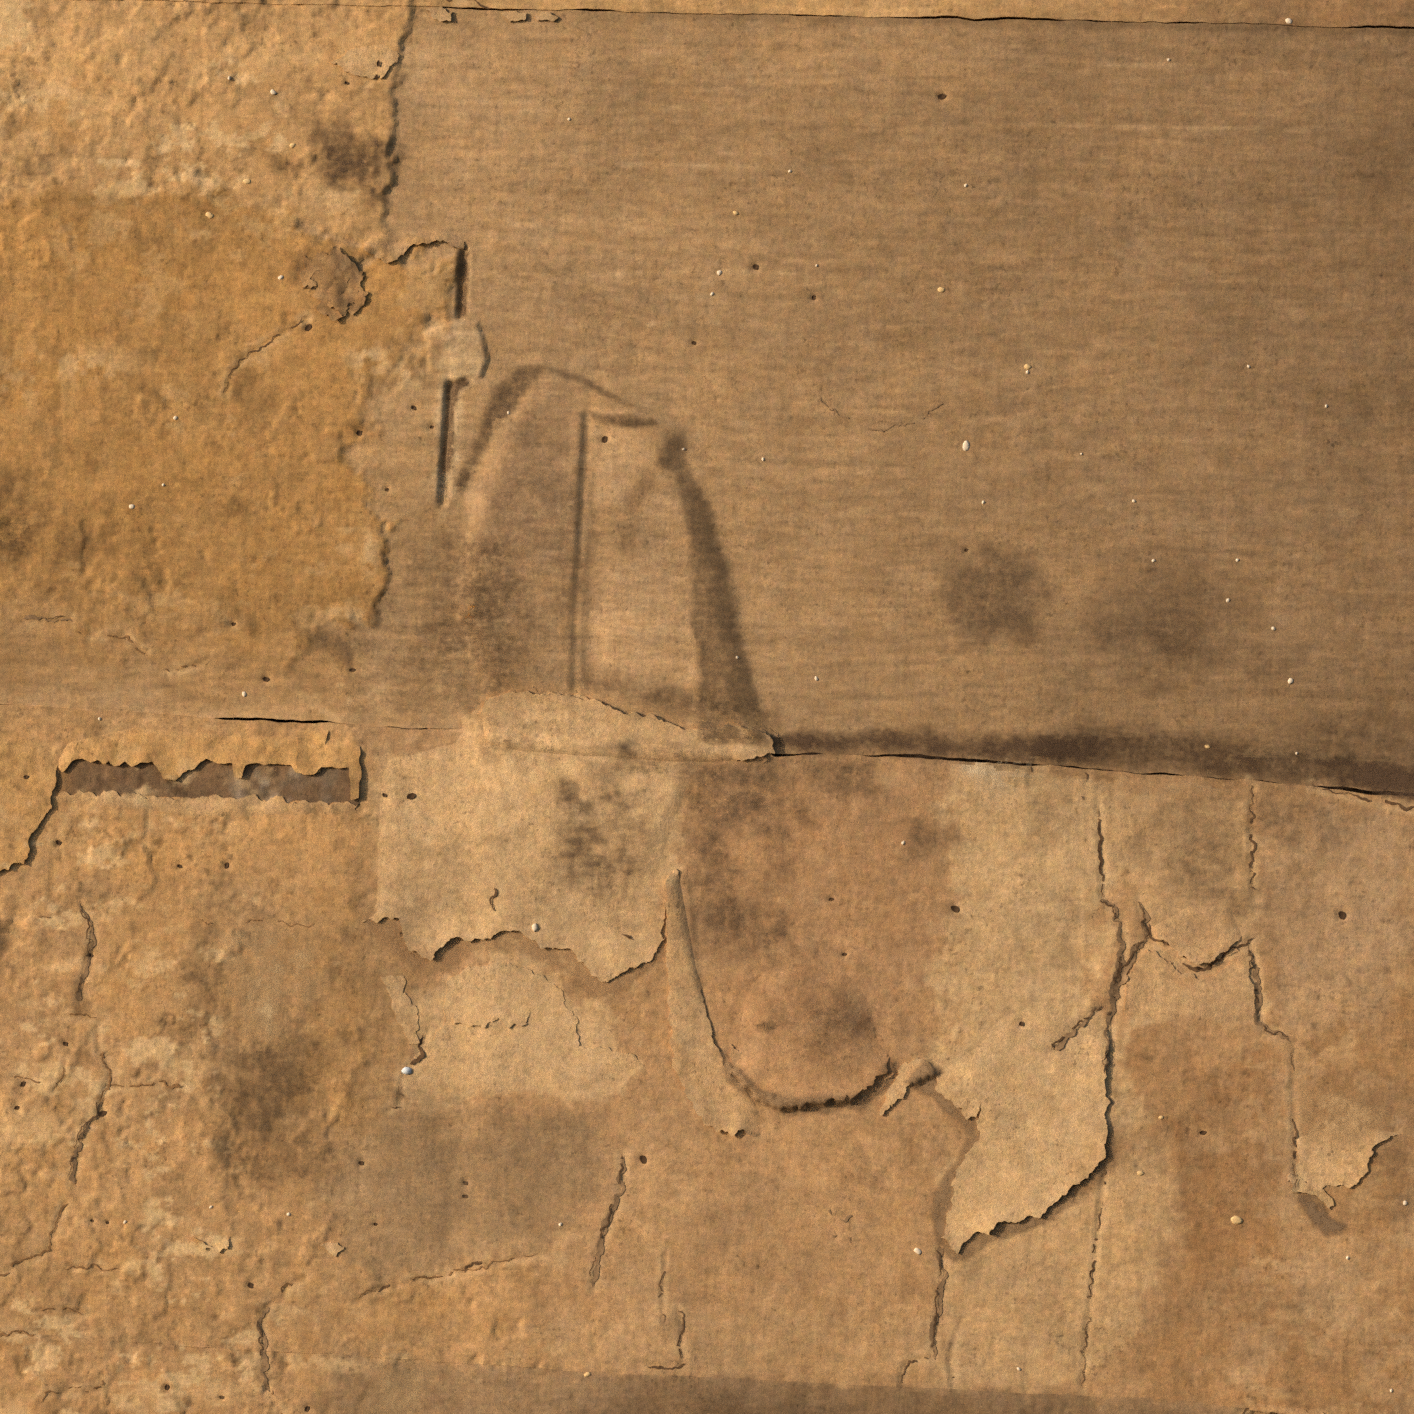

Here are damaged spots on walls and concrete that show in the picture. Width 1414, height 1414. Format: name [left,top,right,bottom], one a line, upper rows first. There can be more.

crack [223,316,304,393]
damp [442,379,468,486]
damp [457,252,467,316]
damp [475,367,538,449]
damp [659,438,1145,781]
peeling [0,728,362,871]
peeling [362,691,775,1137]
crack [1051,773,1294,1073]
crack [589,1154,626,1287]
peeling [879,1004,1114,1261]
crack [1290,1119,1298,1187]
peeling [1287,1094,1401,1236]